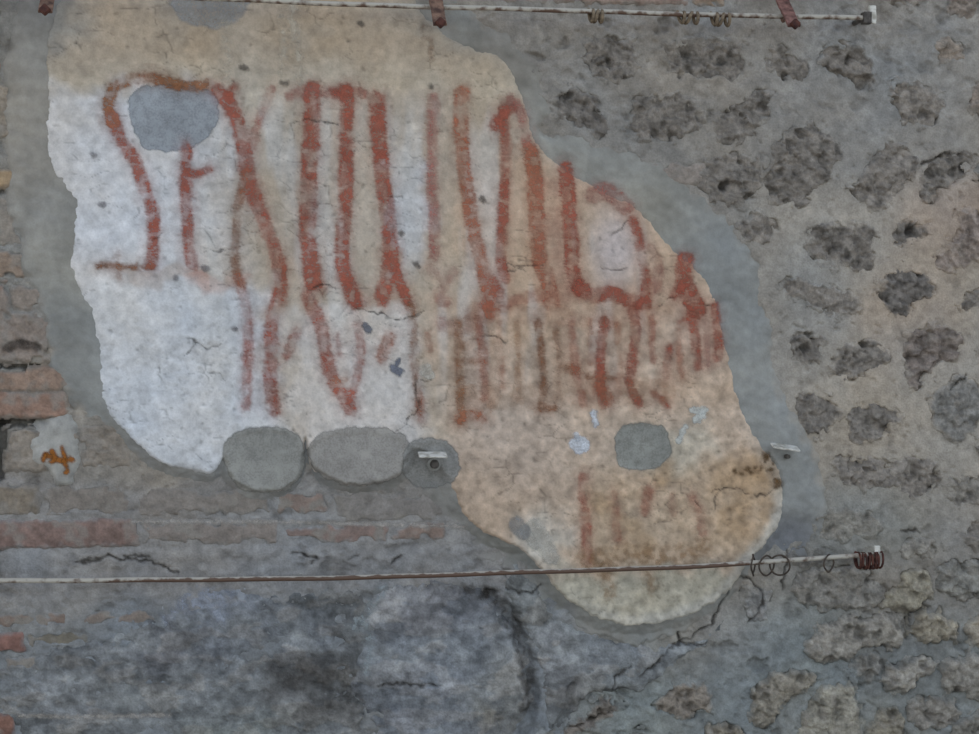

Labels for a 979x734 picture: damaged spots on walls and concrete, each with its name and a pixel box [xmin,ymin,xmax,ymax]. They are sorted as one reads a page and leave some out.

spalling [569,432,590,454]